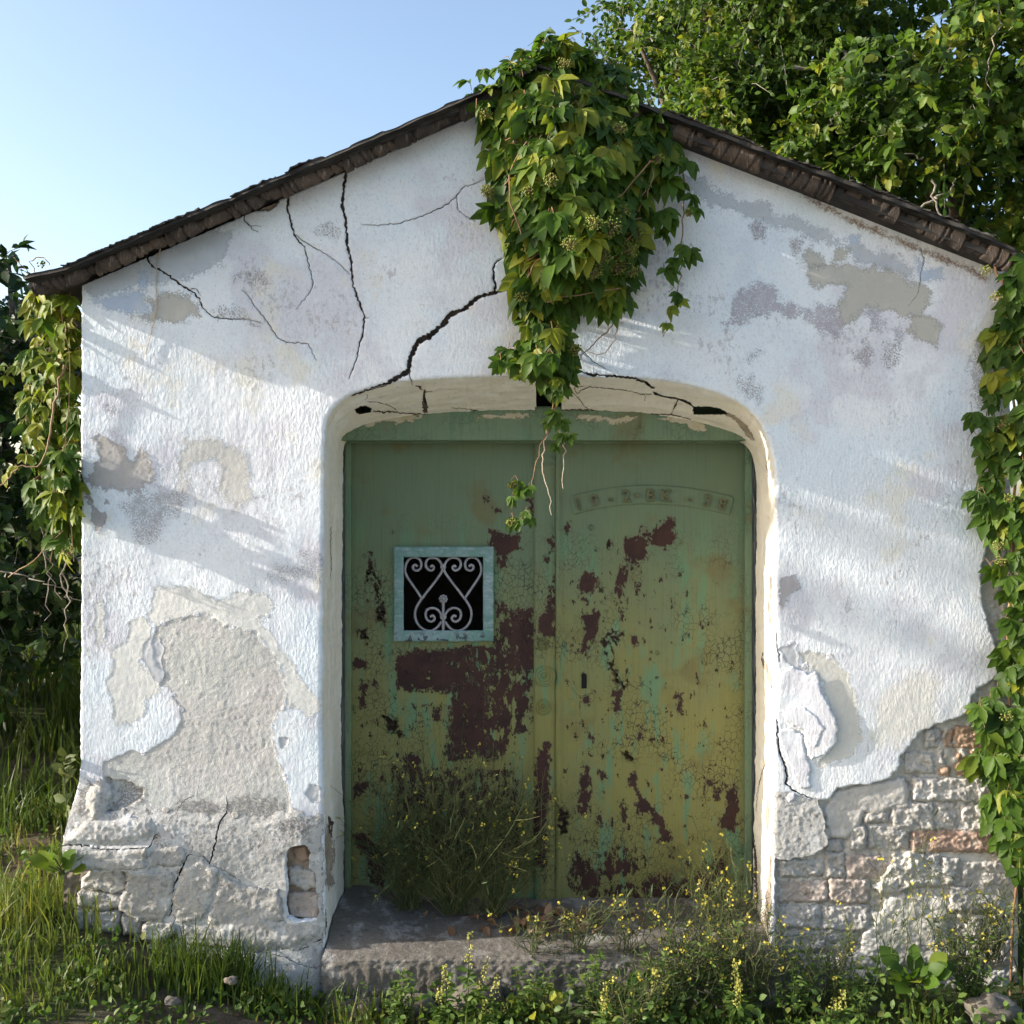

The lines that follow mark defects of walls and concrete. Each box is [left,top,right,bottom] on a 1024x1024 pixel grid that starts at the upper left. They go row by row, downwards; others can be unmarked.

crack [145,254,317,360]
crack [286,171,503,415]
crack [562,350,691,420]
peeling [82,433,155,534]
spalling [980,541,1018,645]
flaking render [62,584,325,998]
crack [169,797,242,916]
spalling [762,640,1018,993]